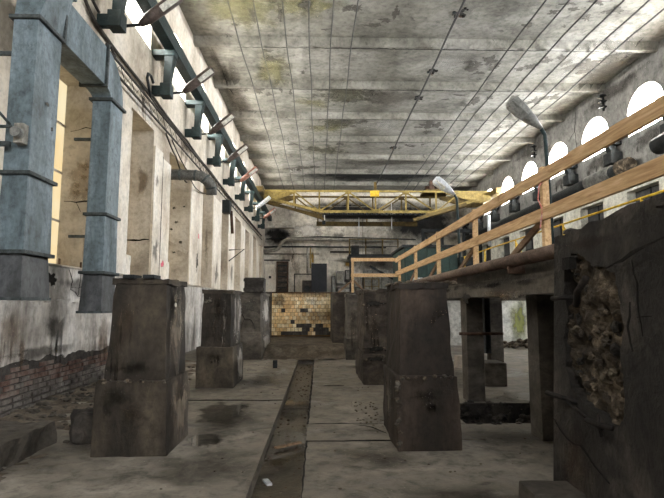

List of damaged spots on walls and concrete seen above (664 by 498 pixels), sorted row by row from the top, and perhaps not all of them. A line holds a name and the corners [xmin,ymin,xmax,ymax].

leakage [324,120,362,128]
peeling [281,320,330,335]
spalling [567,254,625,425]
crack [605,237,664,352]
flaking render [0,352,166,418]